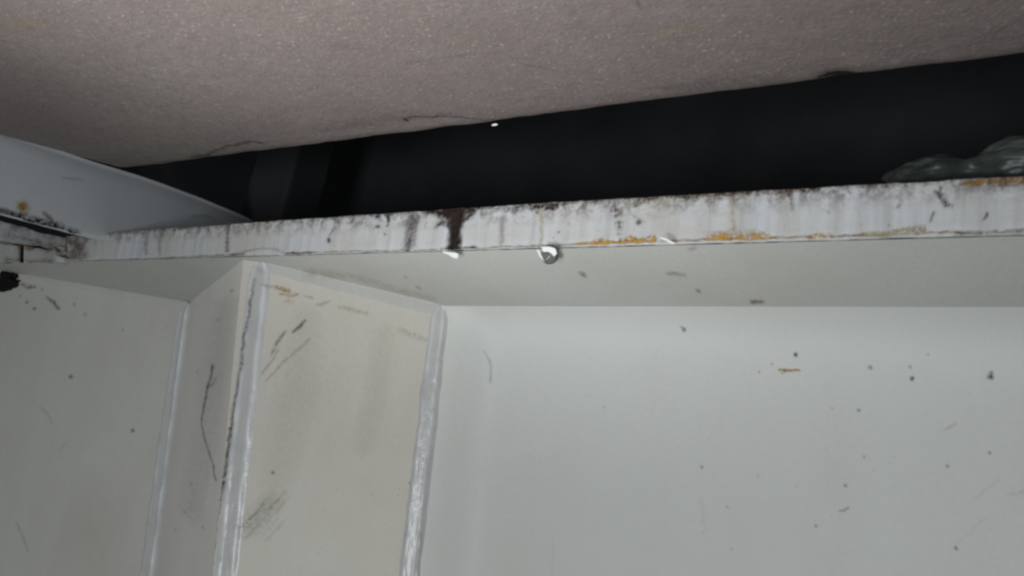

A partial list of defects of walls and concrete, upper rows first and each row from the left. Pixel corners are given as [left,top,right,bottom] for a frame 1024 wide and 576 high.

rust [577,236,656,245]
rust [672,233,776,242]
rust [789,227,974,239]